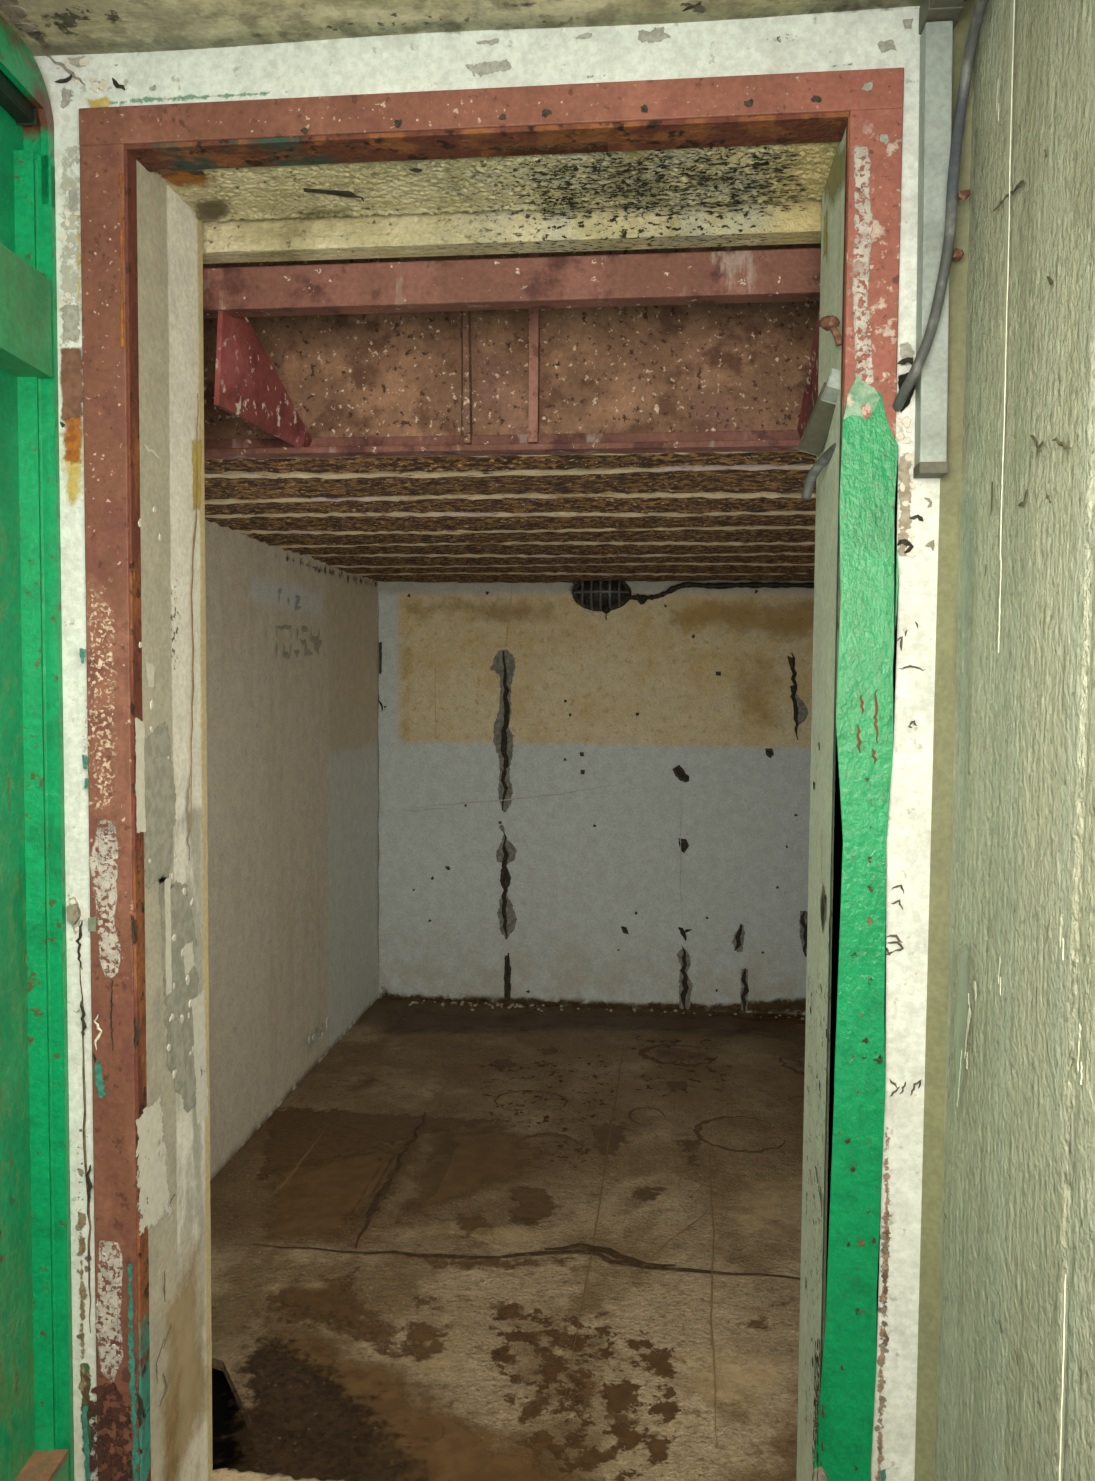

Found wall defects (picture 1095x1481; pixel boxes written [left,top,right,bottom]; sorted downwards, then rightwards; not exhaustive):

peeling [66,587,123,1453]
rust [130,915,138,945]
peeling [135,642,209,1236]
spalling [732,924,745,952]
rust [85,1164,93,1203]
crack [366,1178,392,1222]
rust [82,1263,144,1481]
rust [164,1276,204,1481]
water stain [264,1267,689,1481]